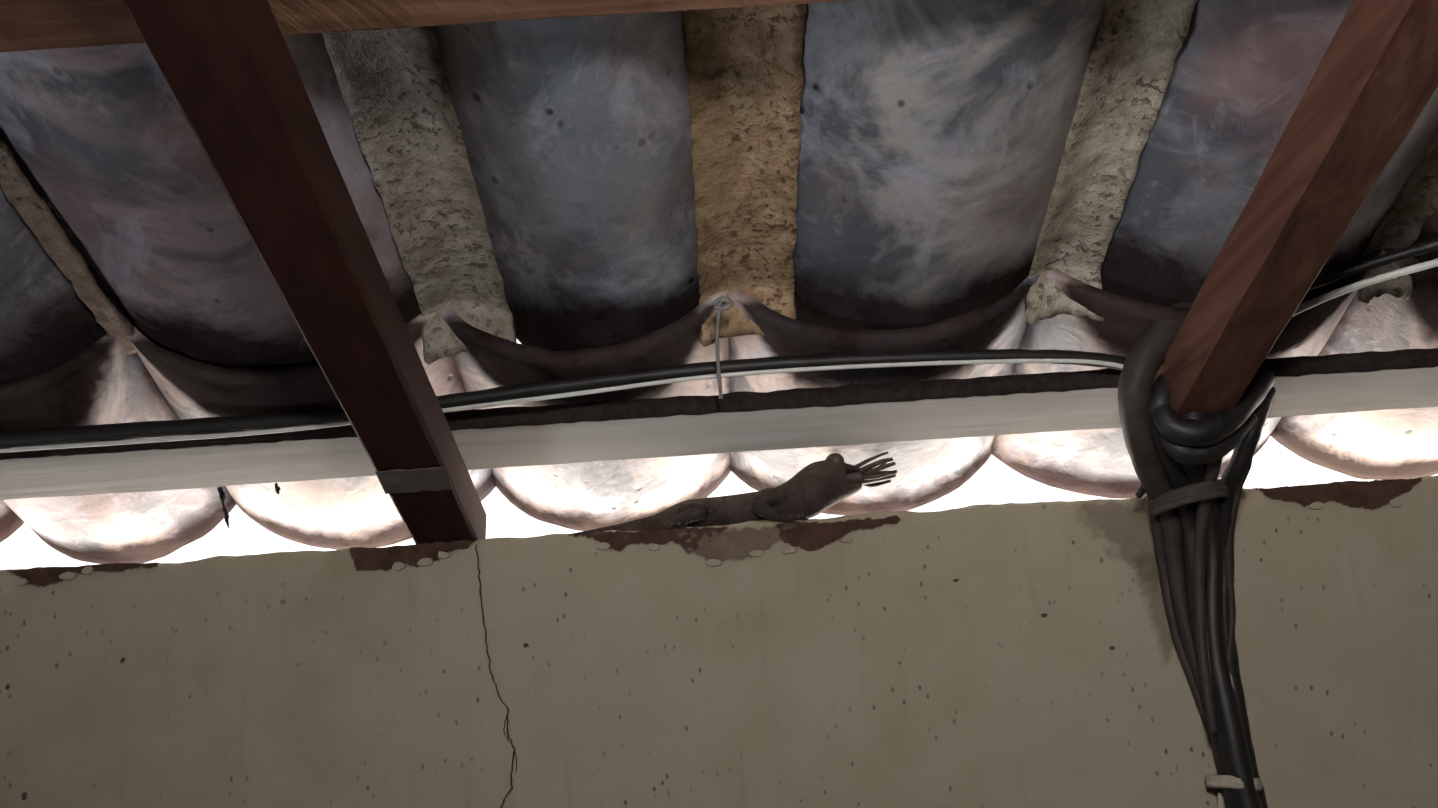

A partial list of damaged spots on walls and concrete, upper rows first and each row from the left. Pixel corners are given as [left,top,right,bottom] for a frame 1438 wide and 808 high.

spalling [349,540,472,571]
peeling [568,516,900,567]
crack [475,544,517,808]